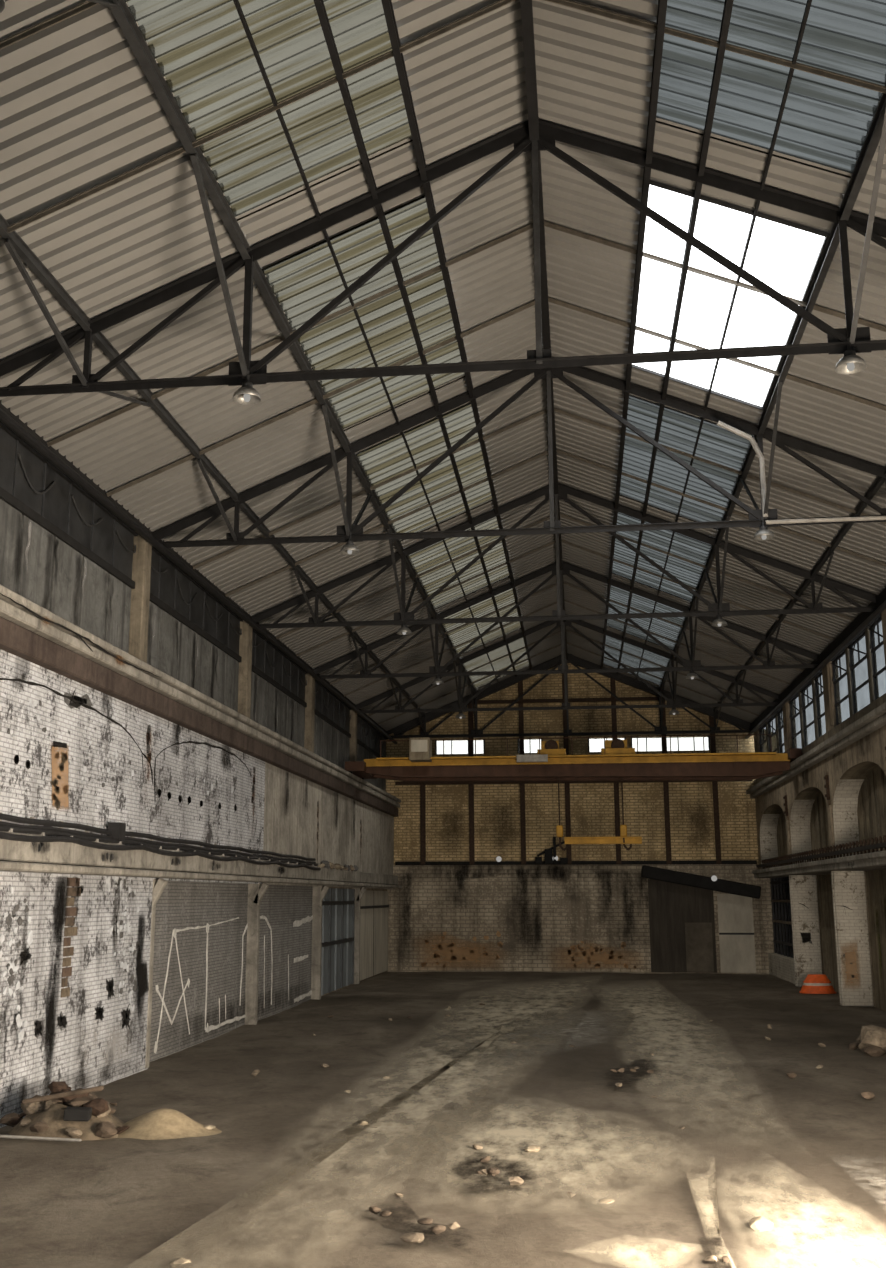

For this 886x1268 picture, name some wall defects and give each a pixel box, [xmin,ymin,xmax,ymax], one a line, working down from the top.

flaking render [0,699,134,810]
spalling [64,692,93,709]
peeling [158,766,237,811]
peeling [0,878,84,1042]
peeling [95,876,140,1029]